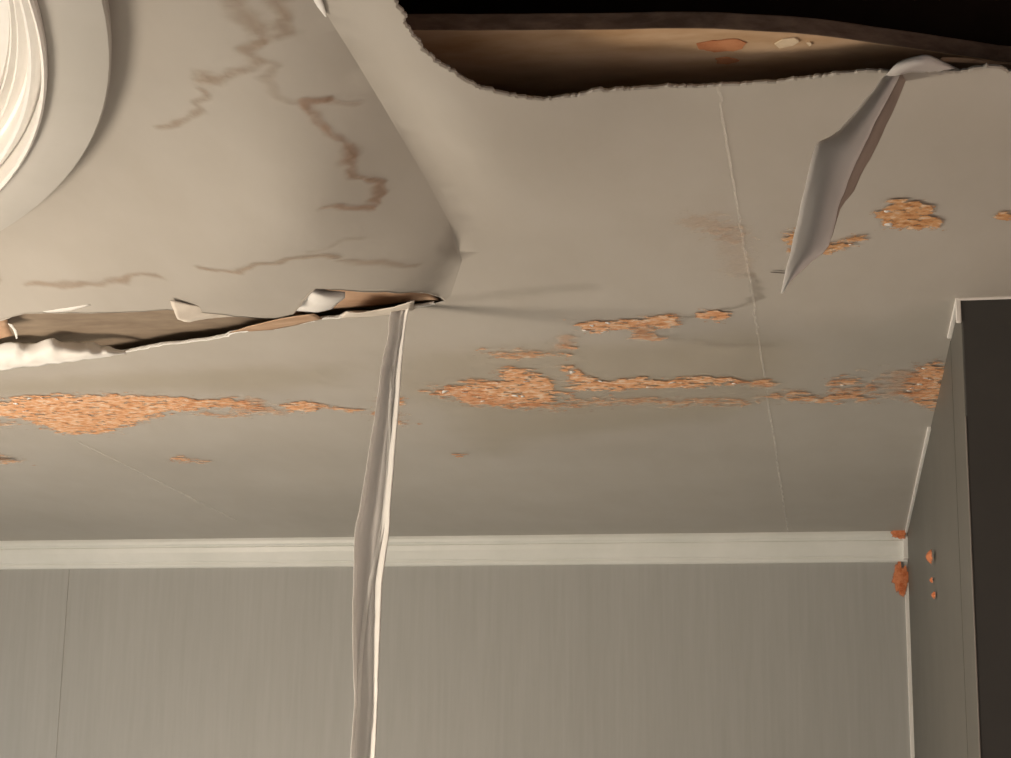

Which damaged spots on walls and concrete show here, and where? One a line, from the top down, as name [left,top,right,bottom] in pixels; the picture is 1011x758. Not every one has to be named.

peeling [870,199,944,231]
peeling [574,314,683,341]
peeling [695,309,732,323]
peeling [420,344,880,409]
peeling [893,362,946,411]
peeling [0,392,375,435]